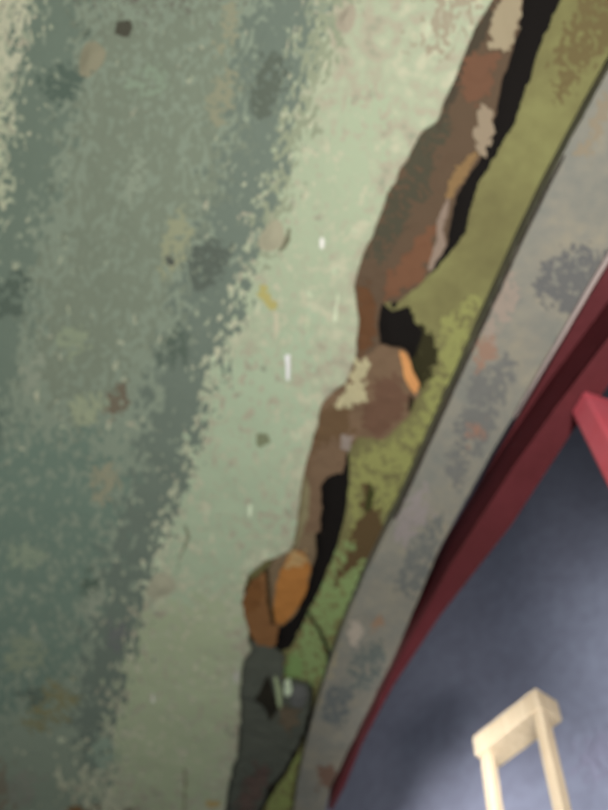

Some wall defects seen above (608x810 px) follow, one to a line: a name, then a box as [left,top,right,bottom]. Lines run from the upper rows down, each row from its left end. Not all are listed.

rust [445,152,478,199]
leakage [0,0,363,810]
spalling [225,0,522,810]
rust [244,579,264,614]
rust [273,550,311,625]